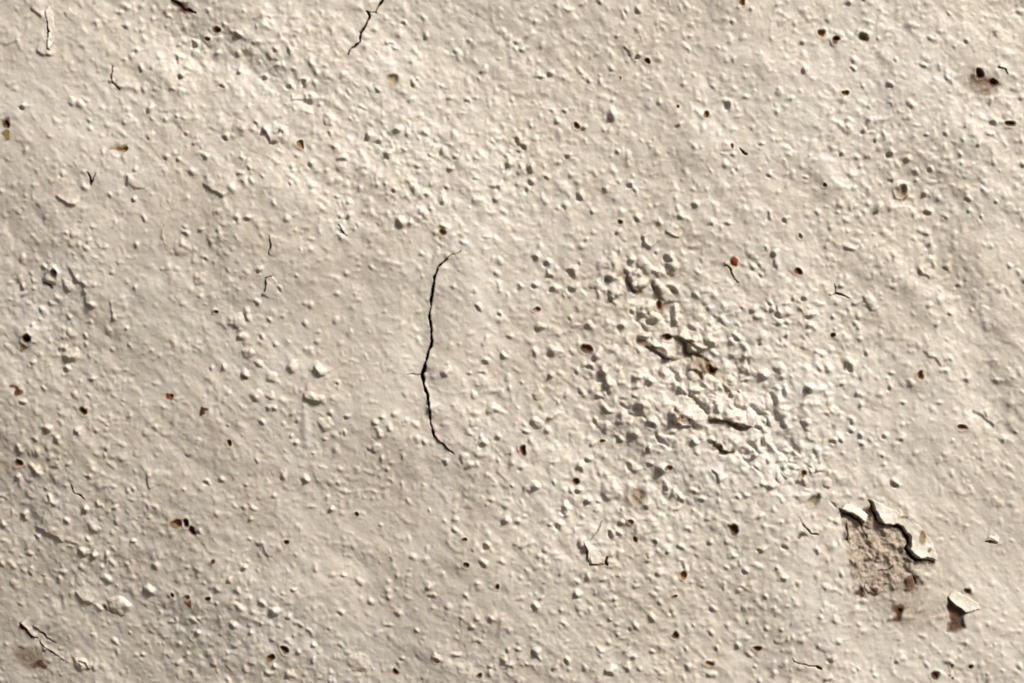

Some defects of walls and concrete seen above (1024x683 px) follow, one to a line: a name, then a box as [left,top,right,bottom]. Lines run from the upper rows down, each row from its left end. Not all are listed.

crack [348,0,384,55]
crack [410,250,461,454]
peeling [839,499,937,596]
peeling [947,589,980,632]